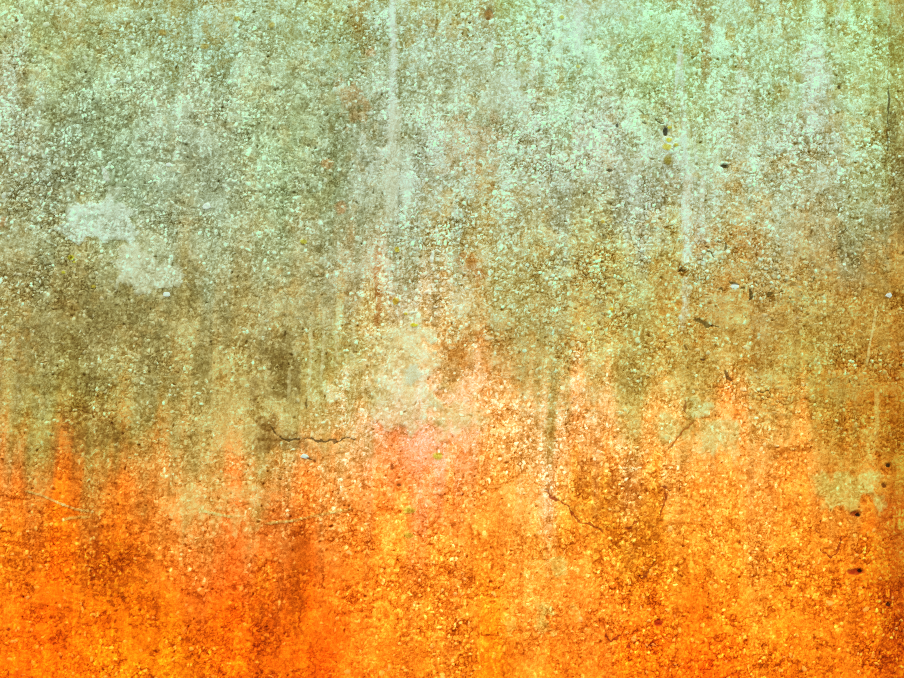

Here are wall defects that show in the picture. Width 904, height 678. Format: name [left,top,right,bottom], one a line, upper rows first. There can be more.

leakage [0,0,357,469]
leakage [382,0,418,258]
crack [270,427,355,460]